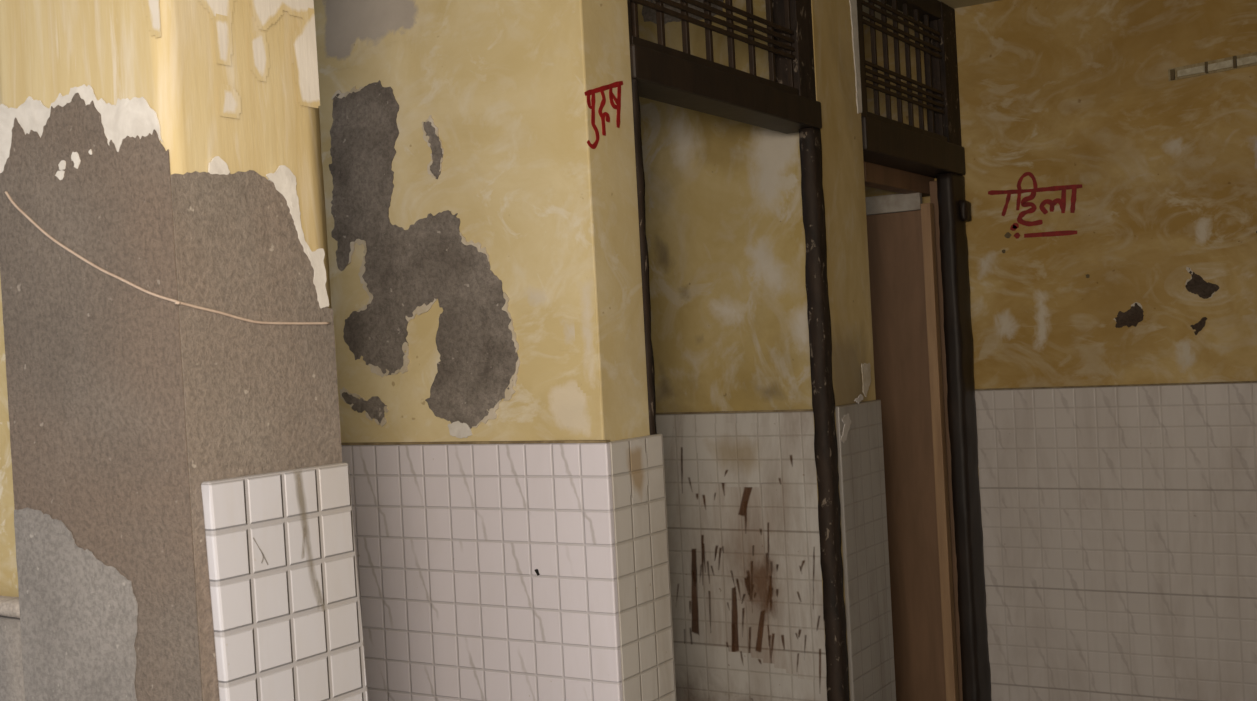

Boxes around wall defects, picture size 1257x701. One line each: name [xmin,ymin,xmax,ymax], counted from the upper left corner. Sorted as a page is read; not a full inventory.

peeling [0,0,520,701]
corrosion [623,439,649,508]
corrosion [660,412,827,701]
peeling [1113,302,1144,328]